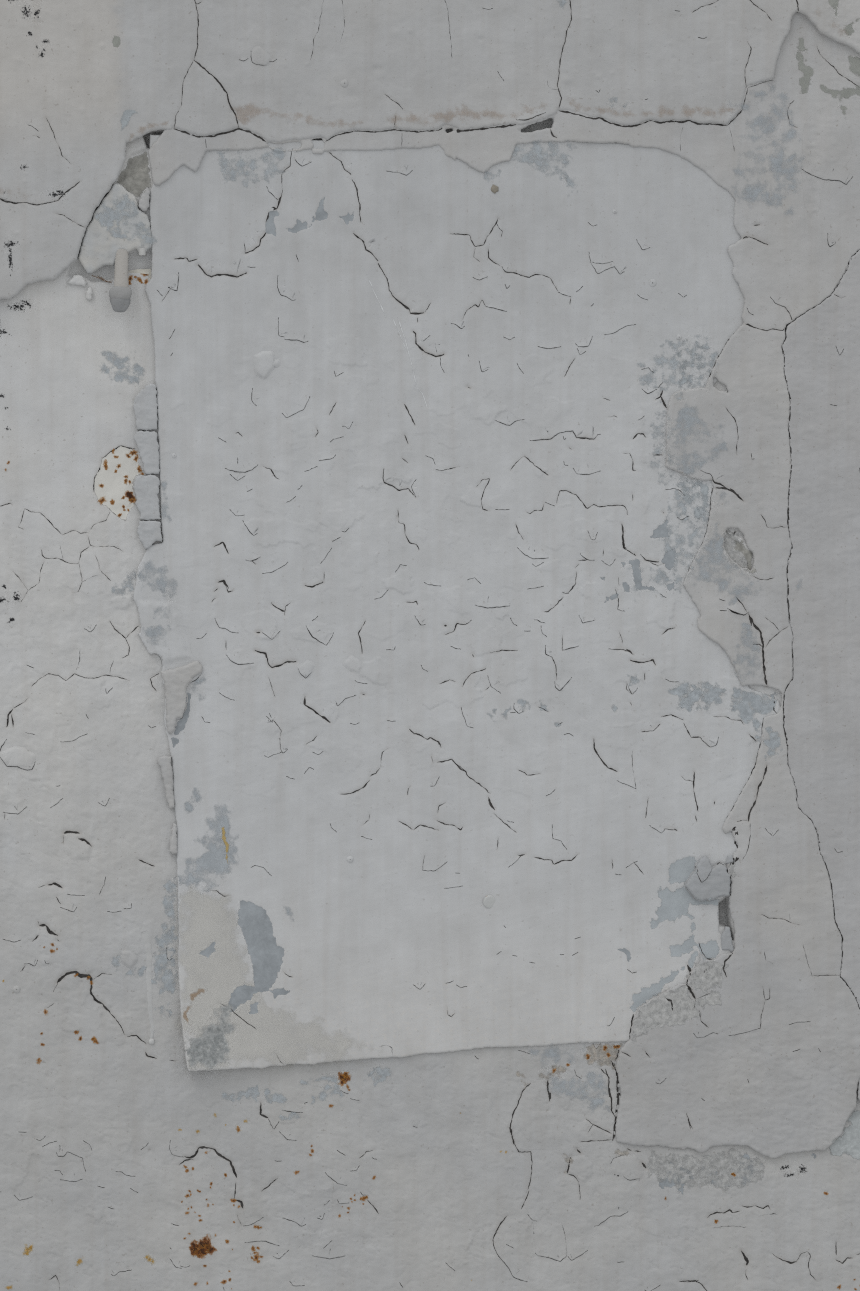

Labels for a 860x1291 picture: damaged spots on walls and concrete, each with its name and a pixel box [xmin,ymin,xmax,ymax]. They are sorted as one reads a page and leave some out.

crack [547,1,773,151]
crack [0,118,113,257]
spalling [95,152,157,243]
crack [174,0,516,373]
peeling [94,446,142,520]
corrosion [99,449,144,517]
peeling [440,335,718,694]
crack [593,251,860,1009]
peeling [184,900,291,1069]
spalling [539,856,729,1079]
corrosion [338,1072,350,1091]
corrosion [181,1174,233,1289]